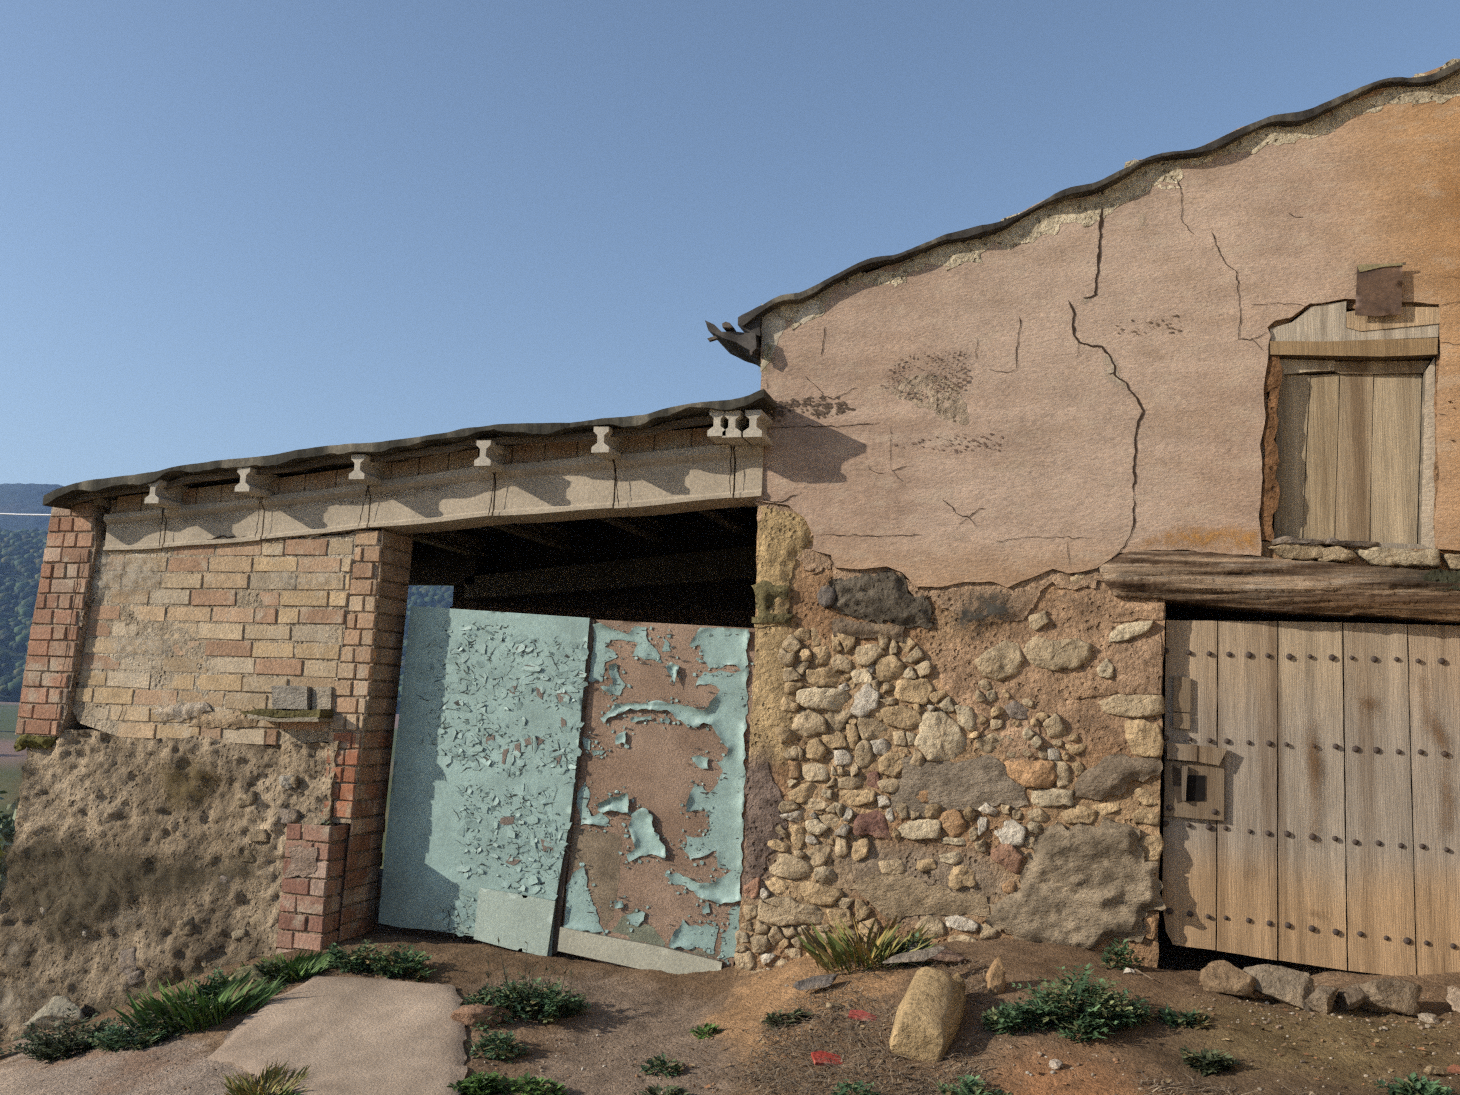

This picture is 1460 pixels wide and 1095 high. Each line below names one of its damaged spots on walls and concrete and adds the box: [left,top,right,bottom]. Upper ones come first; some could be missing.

crack [1177,180,1301,351]
crack [942,191,1144,563]
spalling [754,498,797,522]
crack [812,534,923,564]
spalling [416,532,1165,974]